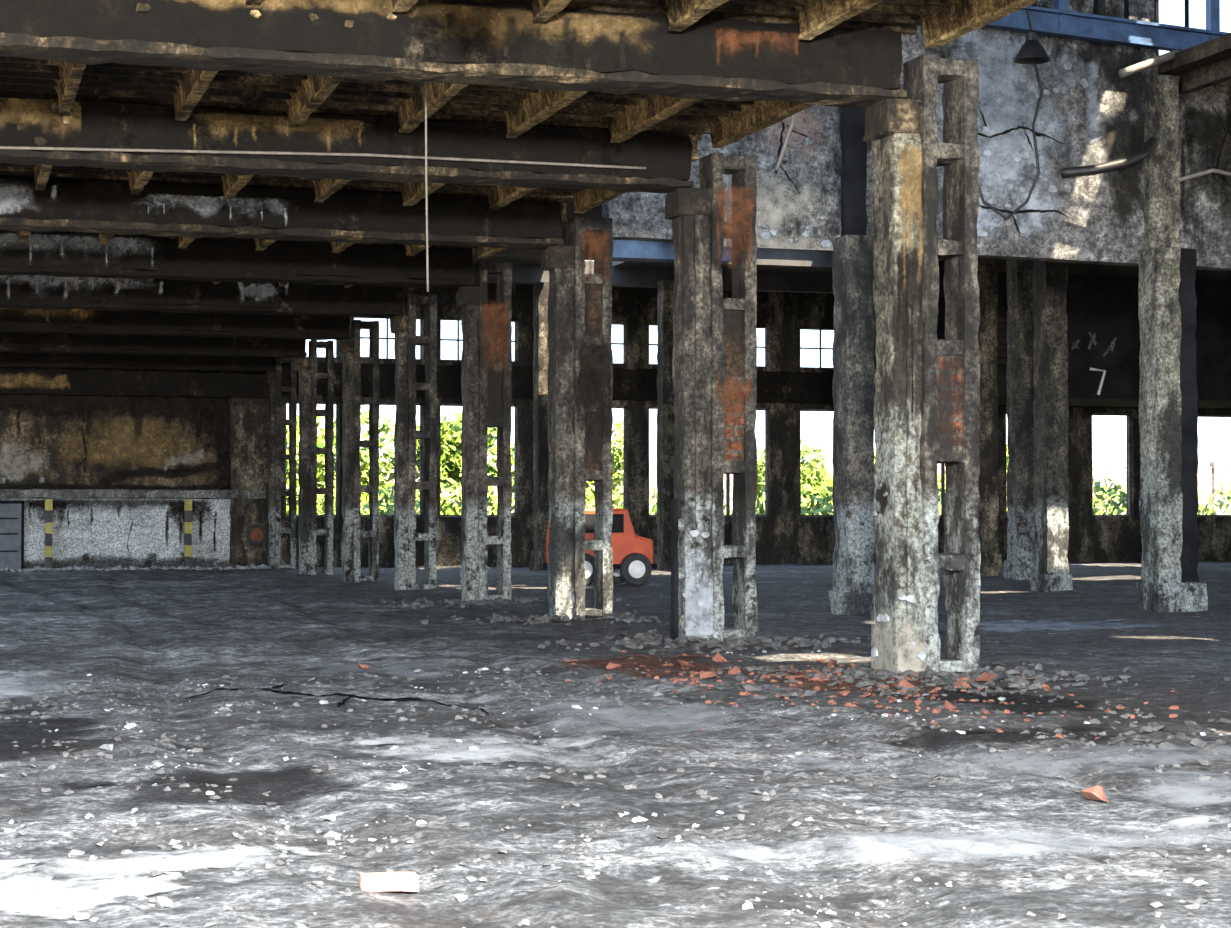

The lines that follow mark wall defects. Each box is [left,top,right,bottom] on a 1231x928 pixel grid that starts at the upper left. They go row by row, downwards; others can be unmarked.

crack [978,107,1064,150]
leakage [0,186,31,212]
leakage [148,194,287,220]
corrosion [717,189,753,264]
crack [979,205,1070,237]
leakage [0,233,153,263]
leakage [0,275,144,319]
leakage [238,282,289,300]
leakage [0,373,70,389]
leakage [61,401,214,469]